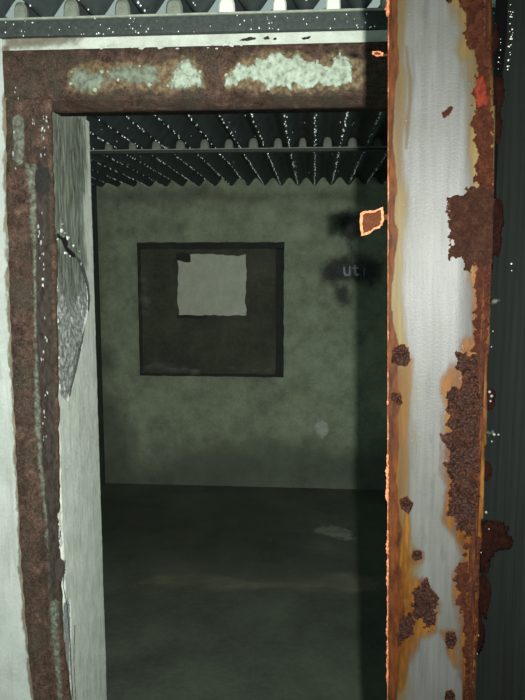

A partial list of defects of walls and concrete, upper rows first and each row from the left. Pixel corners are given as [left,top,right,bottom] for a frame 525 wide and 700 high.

peeling [68,44,205,95]
peeling [224,51,366,94]
corrosion [2,95,34,699]
spalling [57,223,90,400]
corrosion [360,0,494,700]